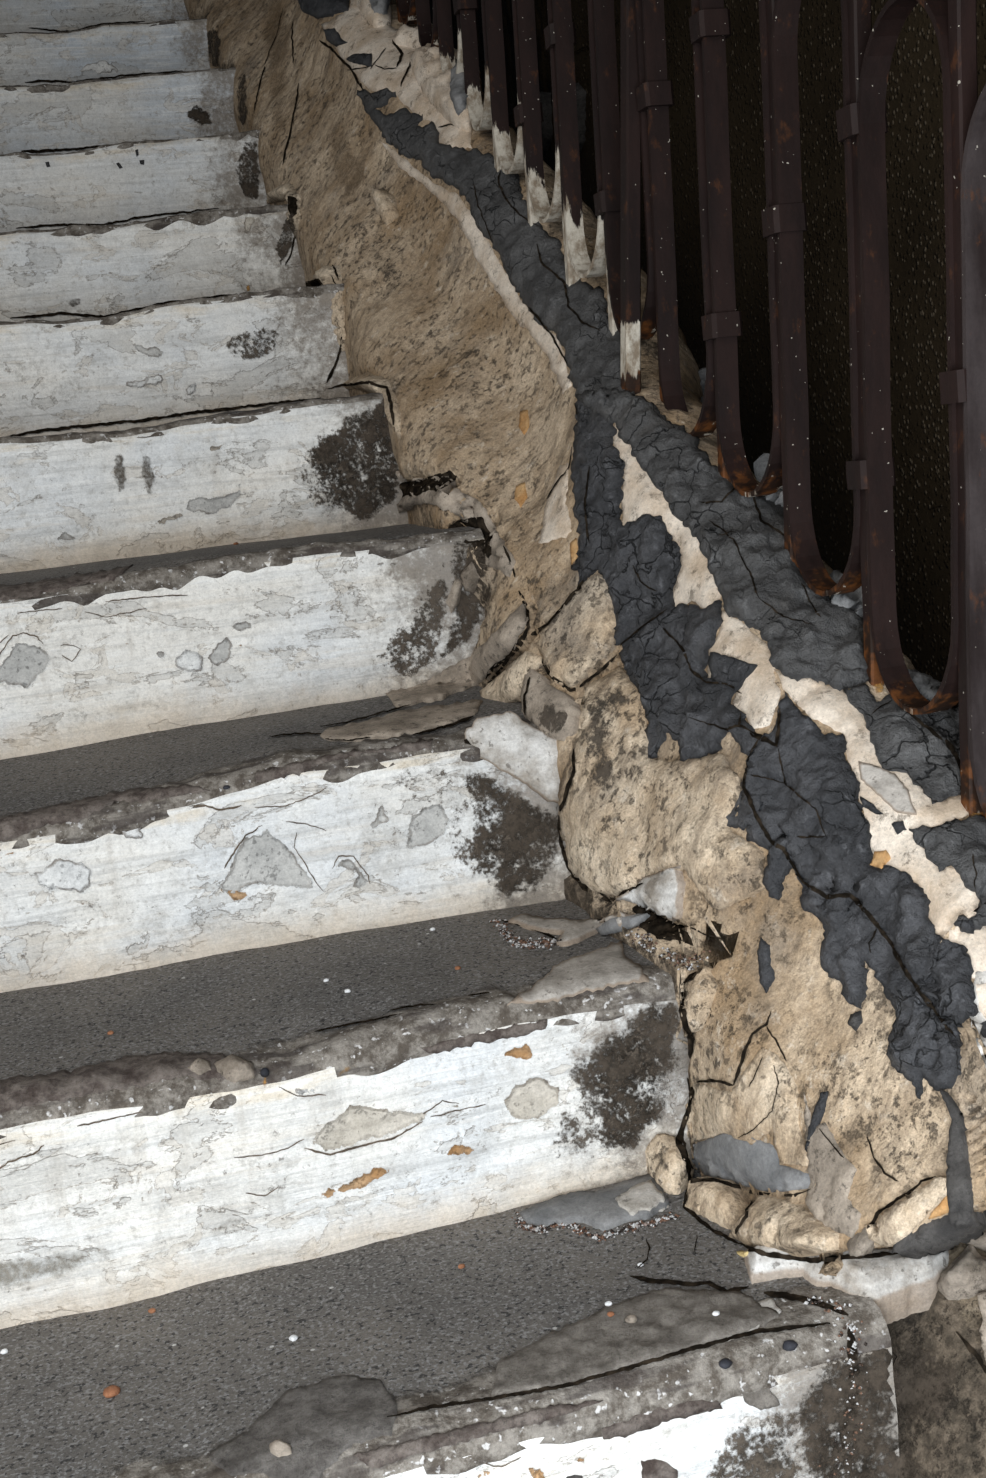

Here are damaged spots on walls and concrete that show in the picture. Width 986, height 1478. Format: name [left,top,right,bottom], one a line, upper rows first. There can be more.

peeling [379,140,572,394]
mould [302,399,399,520]
mould [377,542,492,676]
peeling [255,699,483,783]
peeling [613,423,986,1067]
mould [396,769,561,896]
peeling [422,865,686,1060]
mould [553,1002,681,1158]
crack [387,749,936,1449]
spalling [322,1168,389,1198]
spalling [208,1287,782,1478]
leakage [707,1342,956,1478]